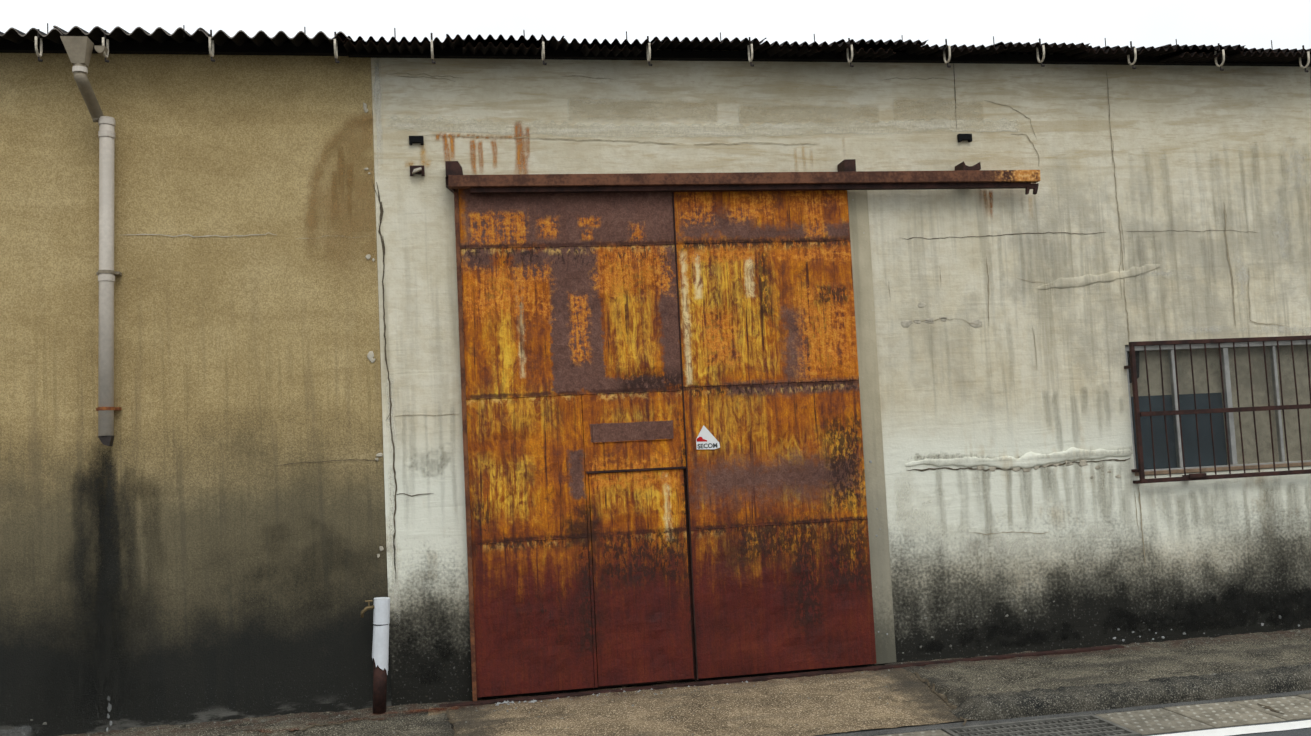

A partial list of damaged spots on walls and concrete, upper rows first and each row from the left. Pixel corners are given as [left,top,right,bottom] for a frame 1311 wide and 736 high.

corrosion [436,134,497,168]
corrosion [515,125,529,172]
leakage [1105,586,1311,633]